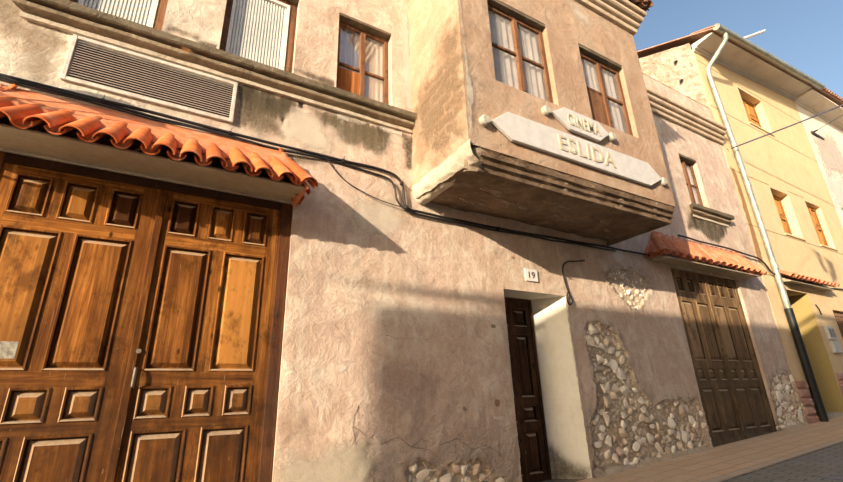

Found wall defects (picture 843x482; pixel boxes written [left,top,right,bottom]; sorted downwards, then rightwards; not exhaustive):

leakage [238,84,389,151]
leakage [400,12,468,168]
spalling [581,245,652,310]
crack [352,405,503,461]
spalling [405,412,522,482]
spalling [564,296,712,475]
spalling [770,373,808,432]